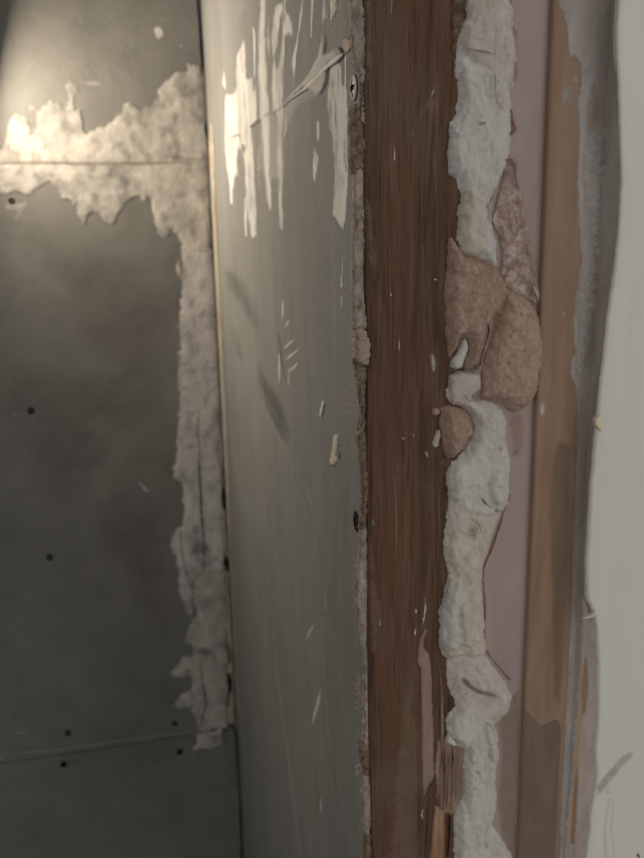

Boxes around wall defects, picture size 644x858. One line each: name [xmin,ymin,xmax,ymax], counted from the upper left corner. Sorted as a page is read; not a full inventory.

peeling [494,72,517,135]
spalling [330,0,373,858]
peeling [520,0,621,858]
peeling [483,498,509,638]
spalling [443,746,454,857]